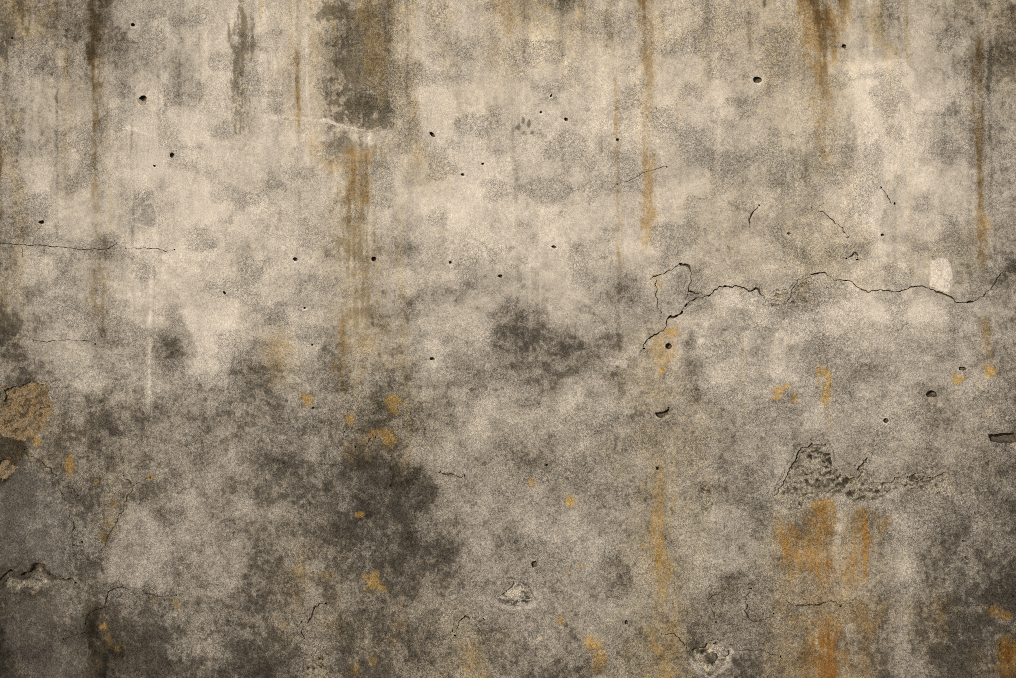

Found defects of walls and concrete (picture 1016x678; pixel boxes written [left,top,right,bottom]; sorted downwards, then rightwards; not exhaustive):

water stain [217,0,408,351]
rust [290,29,417,486]
rust [483,0,584,71]
rust [611,0,666,297]
rust [787,0,855,190]
crack [642,201,1016,348]
spalling [0,375,72,441]
crack [0,560,77,585]
peeling [0,454,89,678]
rust [743,495,923,678]
spalling [769,437,963,512]